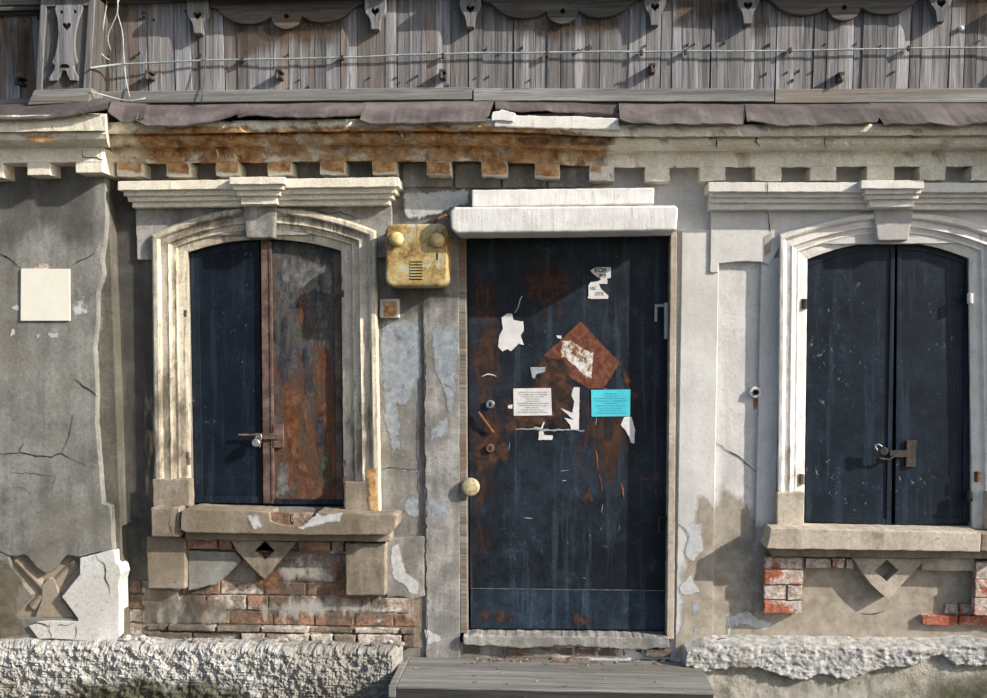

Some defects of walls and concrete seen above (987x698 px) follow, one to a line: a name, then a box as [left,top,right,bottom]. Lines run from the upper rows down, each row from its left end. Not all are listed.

rust [114,125,614,177]
peeling [379,319,459,449]
rust [472,322,637,474]
crack [0,415,84,491]
crack [382,323,428,640]
peeling [400,498,449,519]
peeling [680,523,703,561]
flaking render [0,536,441,647]
peeling [679,575,699,634]
peeling [727,610,774,635]